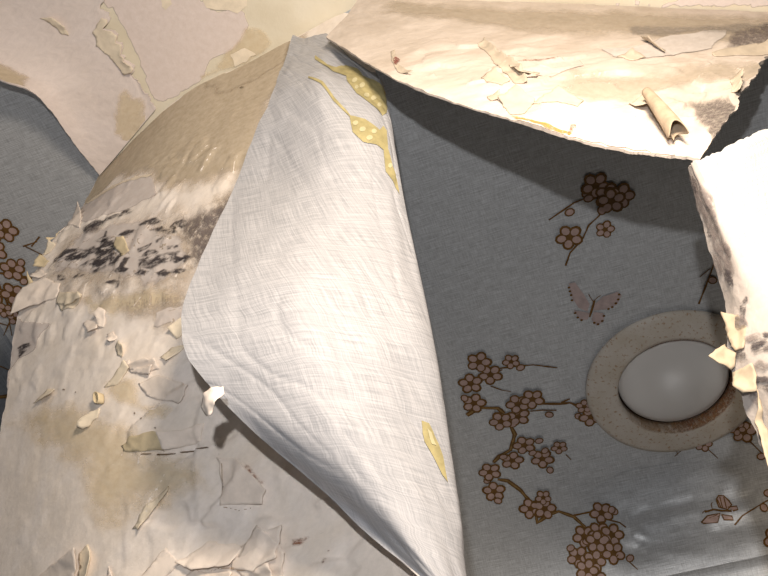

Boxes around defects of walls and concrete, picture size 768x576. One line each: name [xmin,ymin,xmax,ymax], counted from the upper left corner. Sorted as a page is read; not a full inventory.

peeling [92,0,249,101]
peeling [478,37,675,155]
peeling [602,30,768,61]
damp [693,98,735,138]
peeling [7,174,185,389]
damp [54,194,231,314]
mould [689,175,733,286]
peeling [709,312,768,466]
mould [735,297,747,328]
mould [734,332,768,391]
damp [35,411,189,507]
peeling [142,525,285,576]